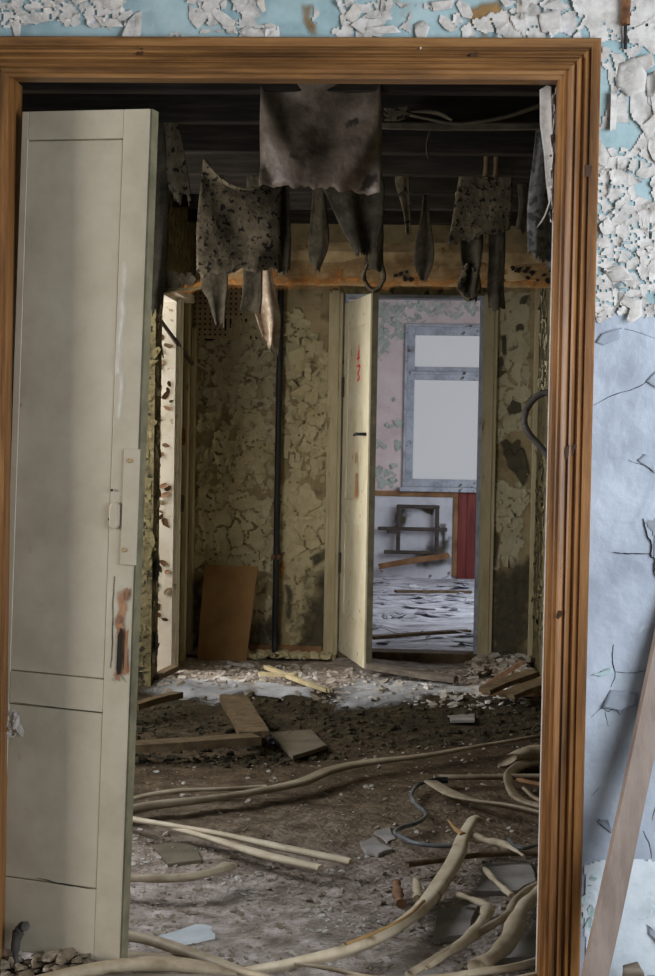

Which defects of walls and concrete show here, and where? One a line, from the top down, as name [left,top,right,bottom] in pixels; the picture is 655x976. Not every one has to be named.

peeling [0,0,185,37]
peeling [186,0,280,37]
peeling [332,0,655,323]
corrosion [272,270,458,289]
crack [596,328,653,345]
crack [596,373,655,404]
peeling [194,307,332,645]
peeling [493,288,547,653]
crack [614,519,655,575]
crack [593,644,646,724]
spalling [581,860,606,949]
spalling [609,859,655,976]